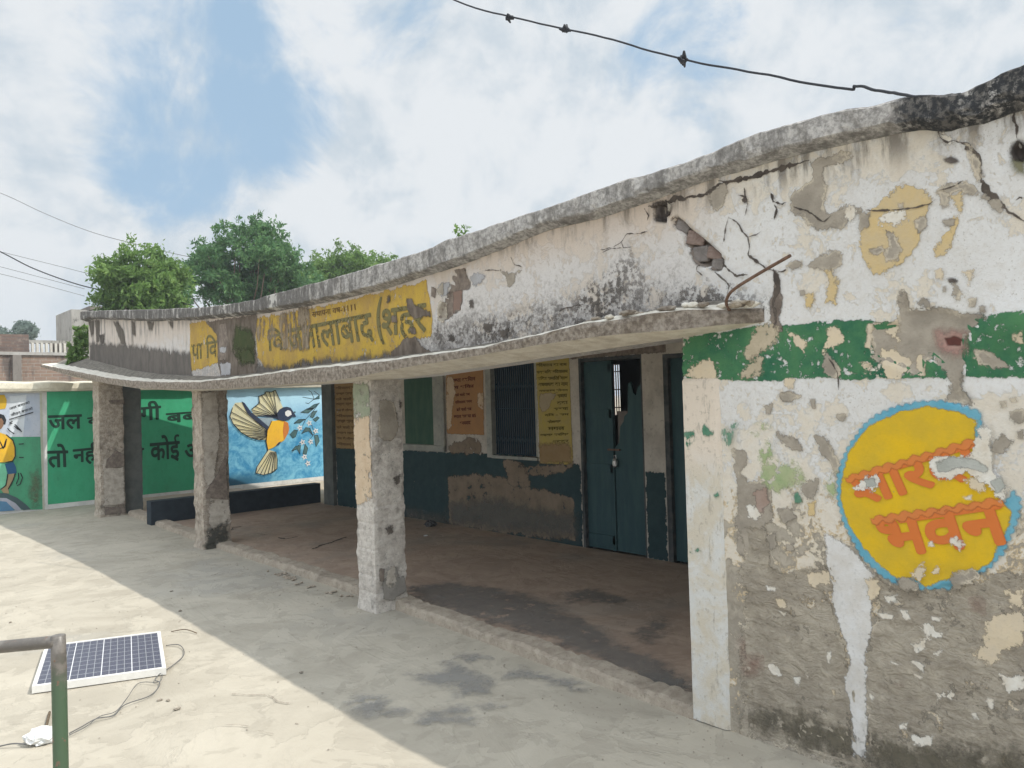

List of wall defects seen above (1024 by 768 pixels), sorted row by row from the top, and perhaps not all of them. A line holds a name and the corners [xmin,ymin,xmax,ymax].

crack [936,131,1024,221]
crack [1011,113,1019,137]
spalling [1010,140,1024,174]
peeling [206,268,522,376]
damp [483,324,509,338]
crack [601,160,809,333]
spalling [652,200,843,311]
spalling [790,150,1009,406]
peeling [447,459,576,541]
peeling [813,434,840,477]
peeling [929,397,1024,500]
peeling [731,448,1024,768]